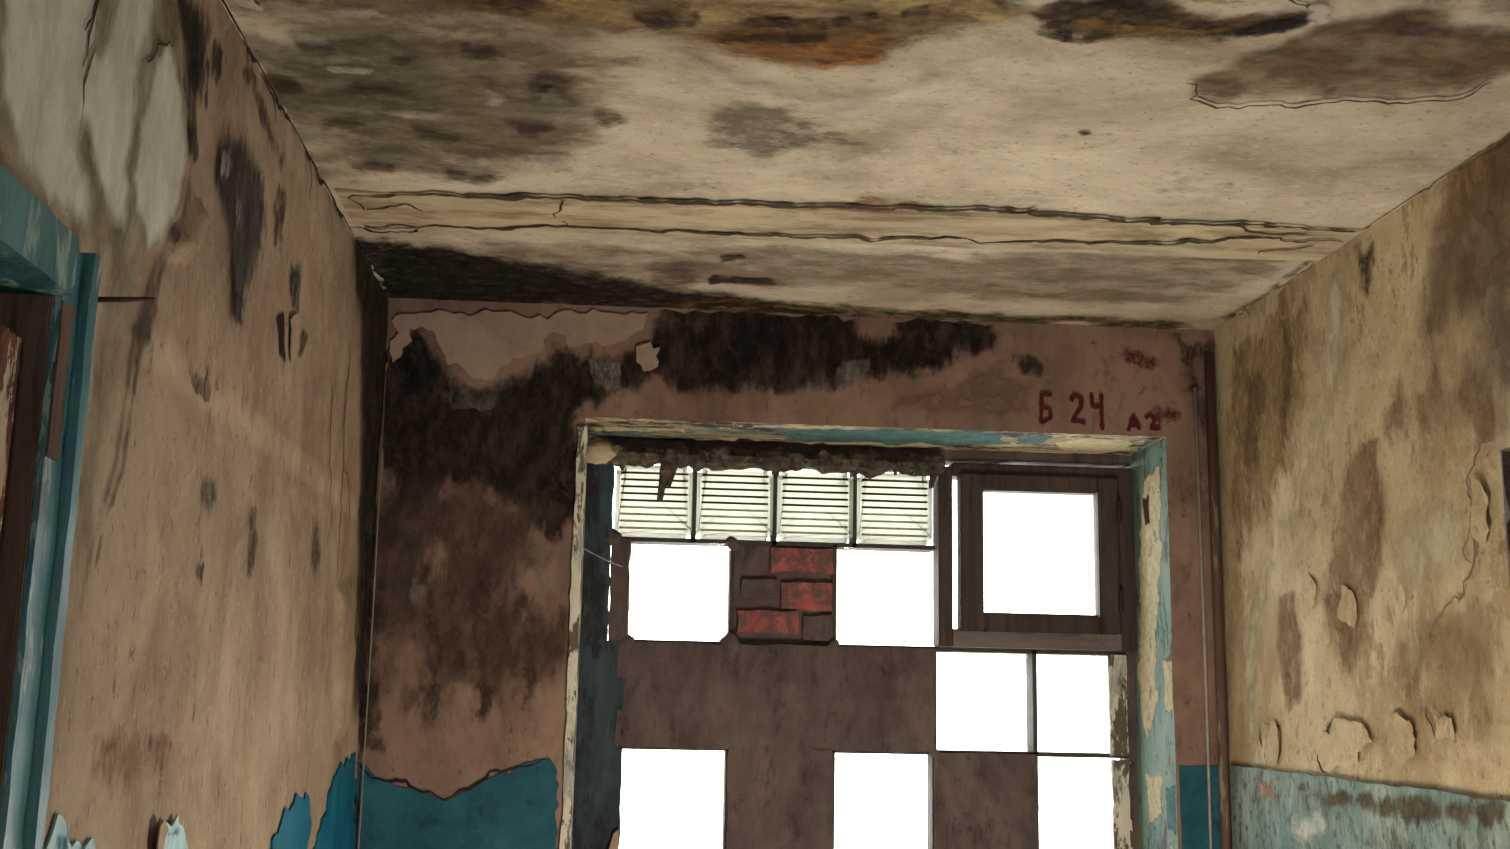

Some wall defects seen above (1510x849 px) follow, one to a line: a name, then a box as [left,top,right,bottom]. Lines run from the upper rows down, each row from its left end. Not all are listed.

crack [83,0,100,66]
peeling [1,0,185,339]
crack [146,37,175,63]
water stain [219,0,1510,325]
crack [221,0,1510,328]
peeling [156,815,188,849]
peeling [271,752,559,849]
water stain [358,473,567,758]
spalling [600,429,1156,501]
water stain [488,243,1309,560]
peeling [1107,466,1510,849]
water stain [1324,134,1510,671]